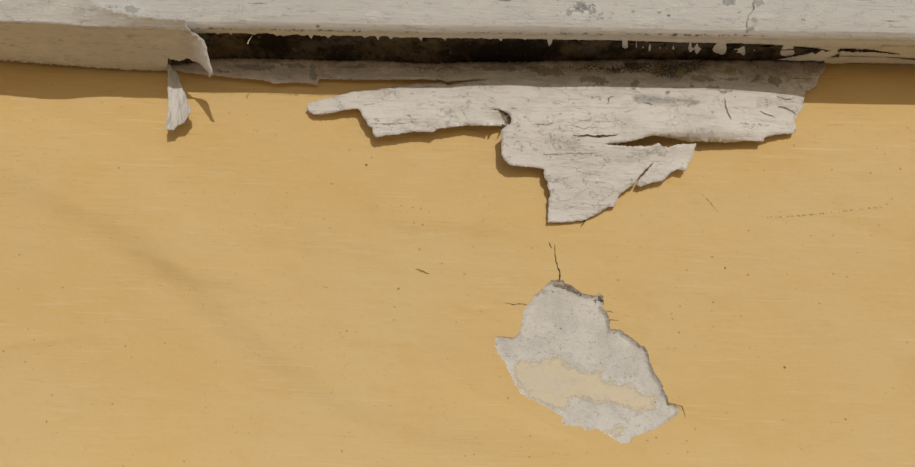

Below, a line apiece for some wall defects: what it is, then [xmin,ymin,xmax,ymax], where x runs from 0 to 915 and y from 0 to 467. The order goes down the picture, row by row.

crack [746,0,764,31]
peeling [0,0,915,223]
spalling [495,280,681,444]